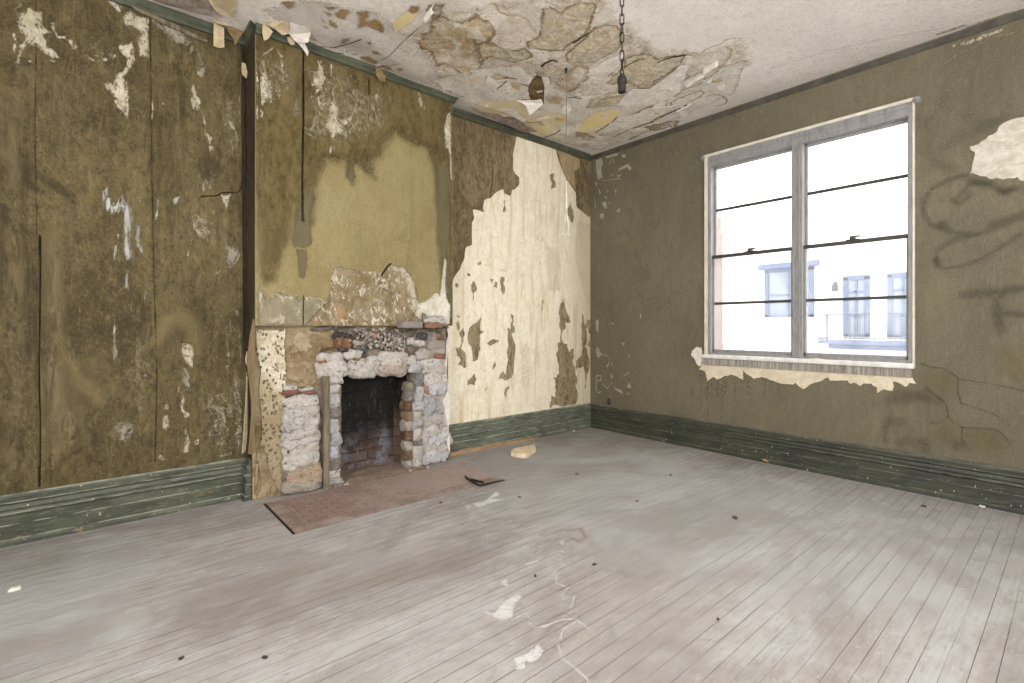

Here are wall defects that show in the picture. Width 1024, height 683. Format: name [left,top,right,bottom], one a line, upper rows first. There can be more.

peeling [102,1,150,118]
crack [200,180,242,197]
water stain [255,34,453,325]
peeling [265,0,746,425]
spalling [970,117,1024,181]
spalling [691,347,916,393]